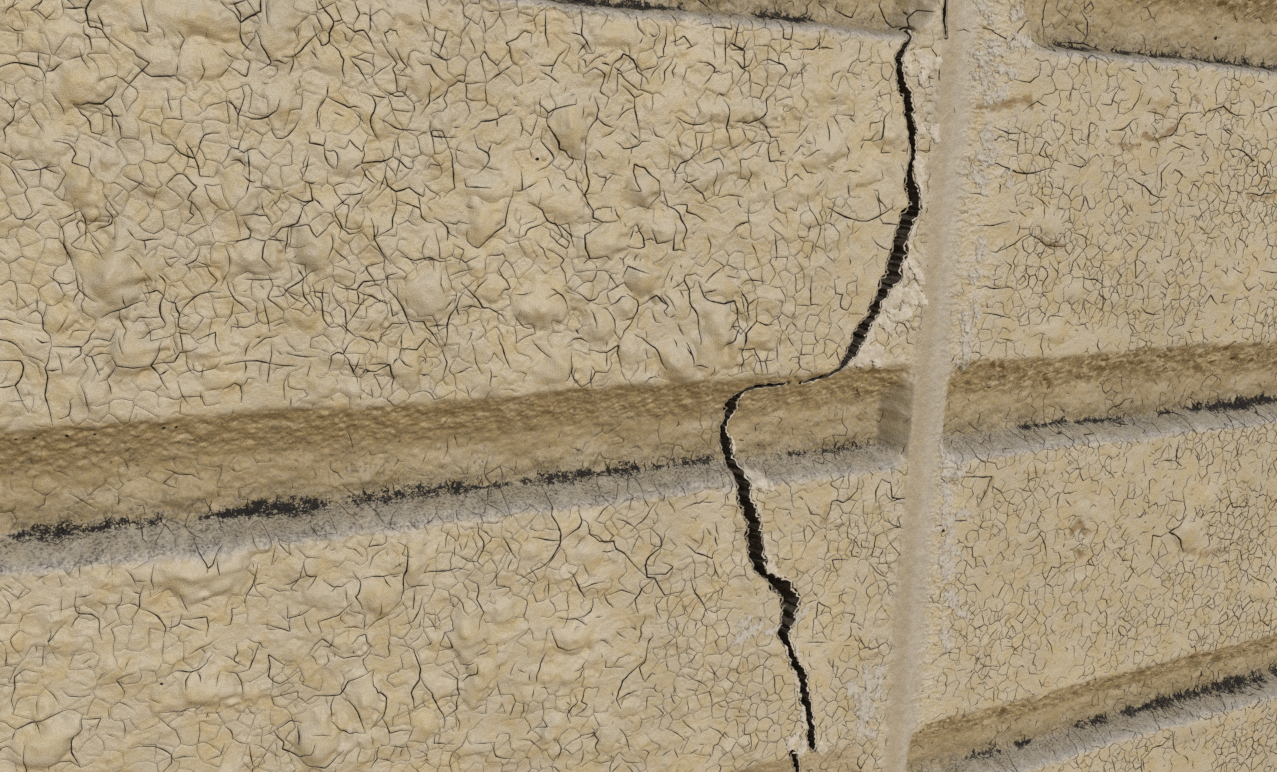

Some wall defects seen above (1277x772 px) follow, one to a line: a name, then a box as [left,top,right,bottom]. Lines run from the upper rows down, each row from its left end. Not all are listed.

crack [952,0,1277,365]
crack [0,0,969,772]
crack [922,367,1277,772]